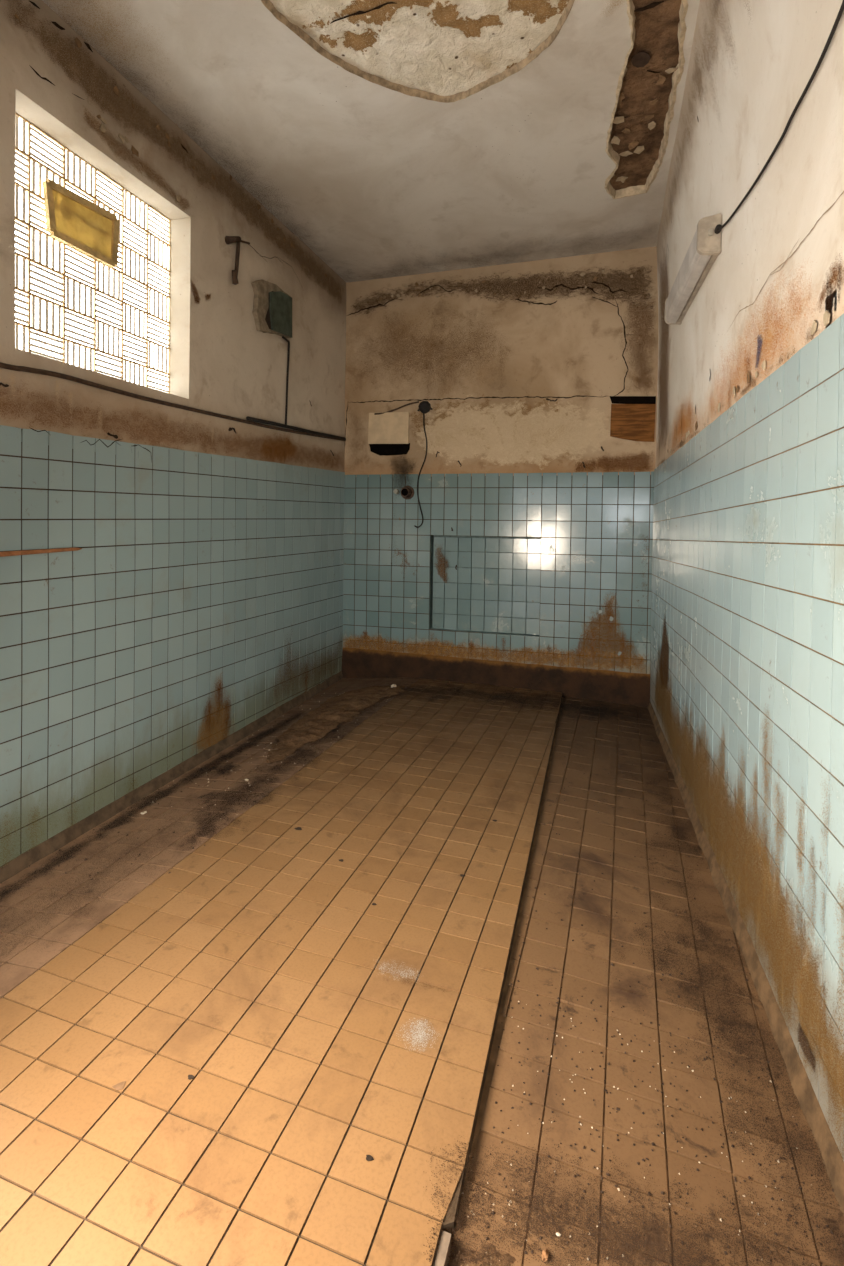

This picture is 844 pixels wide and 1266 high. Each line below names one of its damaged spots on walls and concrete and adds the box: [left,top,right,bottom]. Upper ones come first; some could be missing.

leakage [0,297,612,475]
peeling [2,0,656,318]
leakage [43,0,736,458]
crack [345,297,633,436]
spalling [604,0,688,199]
rust [669,253,844,456]
crack [728,191,844,330]
leakage [689,704,844,1050]